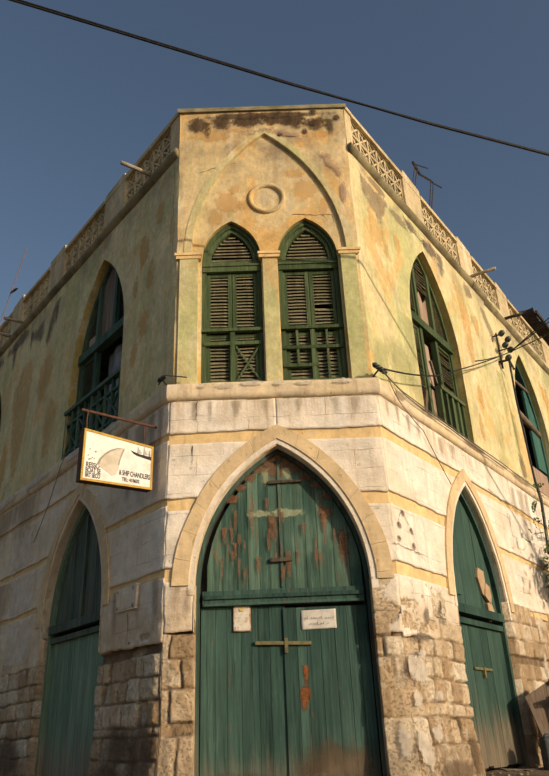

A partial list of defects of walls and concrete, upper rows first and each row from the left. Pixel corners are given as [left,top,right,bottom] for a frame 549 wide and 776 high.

leakage [189,111,333,136]
flaking render [376,598,437,634]
peeling [408,649,426,675]
rust [300,665,311,710]
peeling [399,721,413,758]